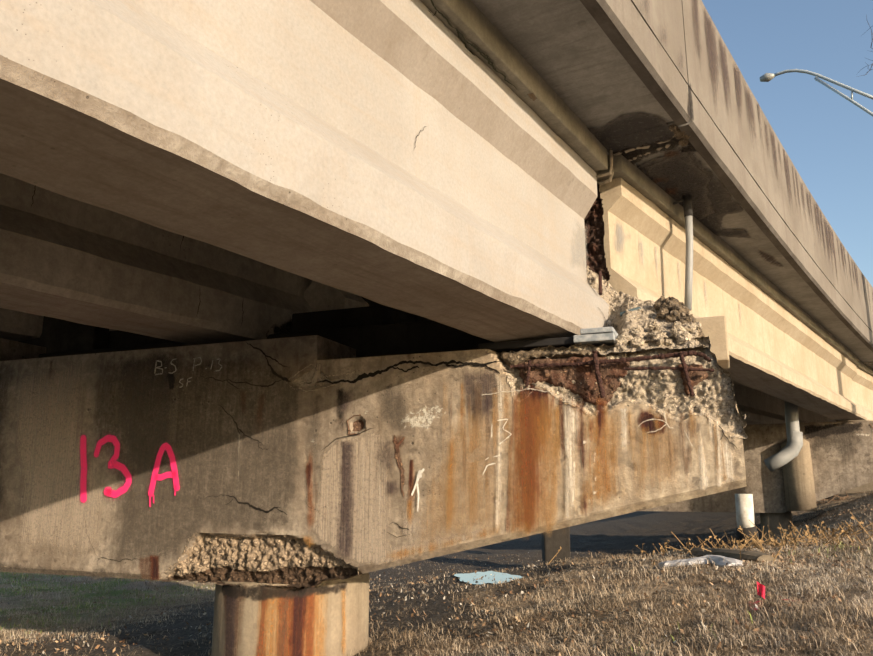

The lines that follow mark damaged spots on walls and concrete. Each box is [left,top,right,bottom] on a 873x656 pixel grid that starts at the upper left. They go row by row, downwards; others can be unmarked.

crack [429,0,519,91]
damp [588,113,750,238]
crack [202,299,505,389]
spalling [495,221,748,439]
crack [206,494,288,515]
spalling [157,414,486,588]
corrosion [393,435,413,520]
corrosion [506,386,563,533]
corrosion [577,399,616,514]
corrosion [638,411,666,434]
corrosion [225,586,246,656]
corrosion [256,586,324,656]